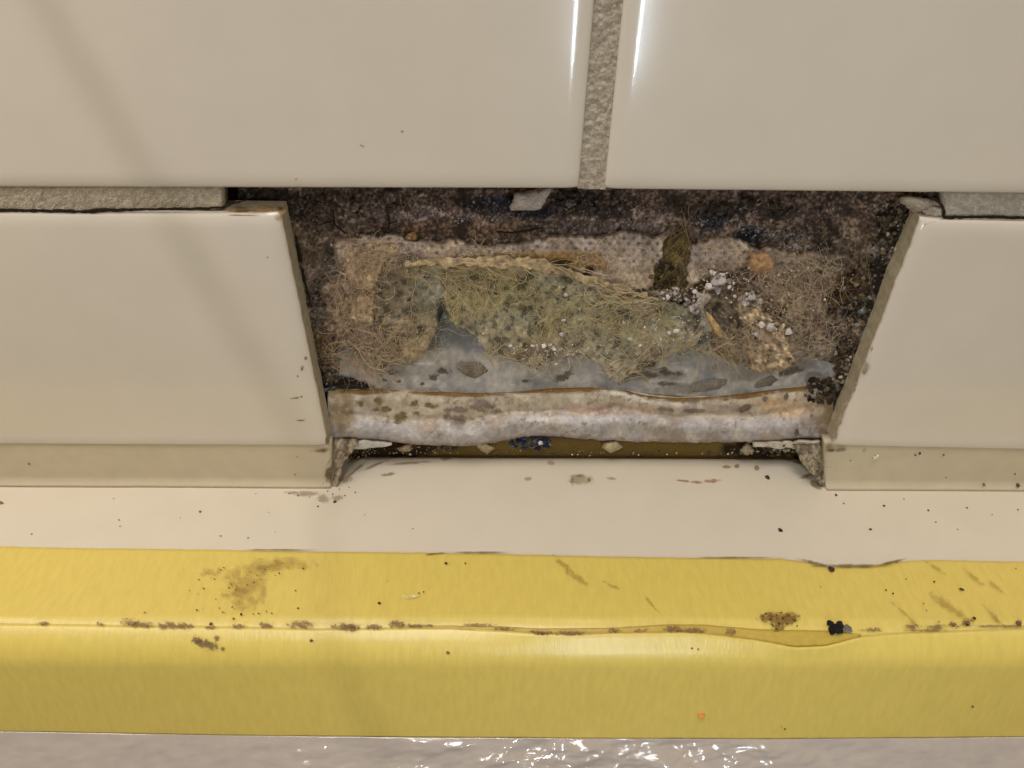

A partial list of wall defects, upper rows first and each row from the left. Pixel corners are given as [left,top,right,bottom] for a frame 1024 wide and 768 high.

damp [650,219,822,293]
peeling [697,290,711,312]
damp [640,361,683,386]
damp [779,367,803,376]
damp [357,397,498,424]